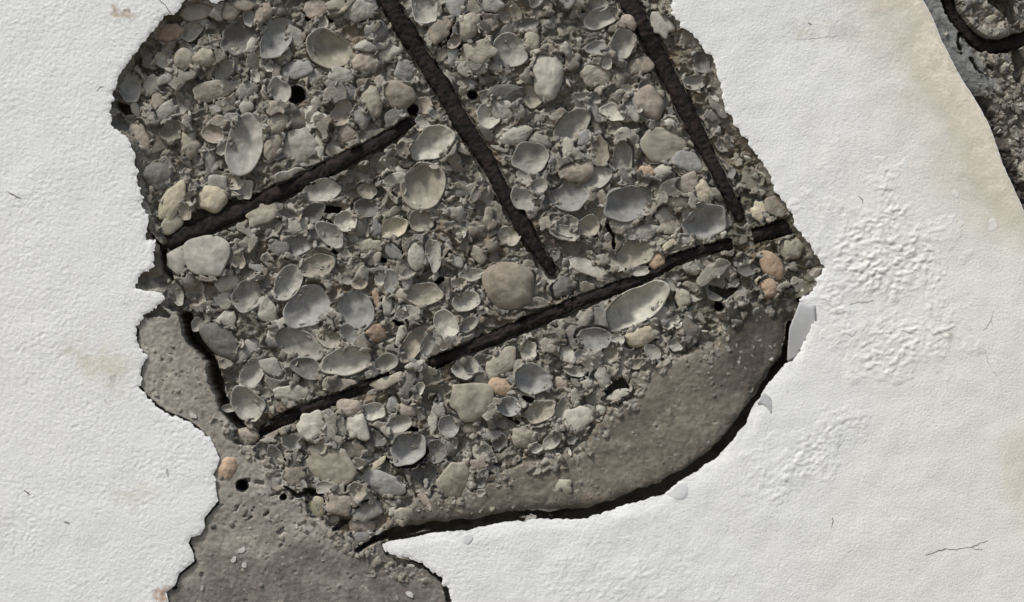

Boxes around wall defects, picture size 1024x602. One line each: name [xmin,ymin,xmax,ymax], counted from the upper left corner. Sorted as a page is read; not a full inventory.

spalling [109,0,825,602]
spalling [923,0,1024,210]